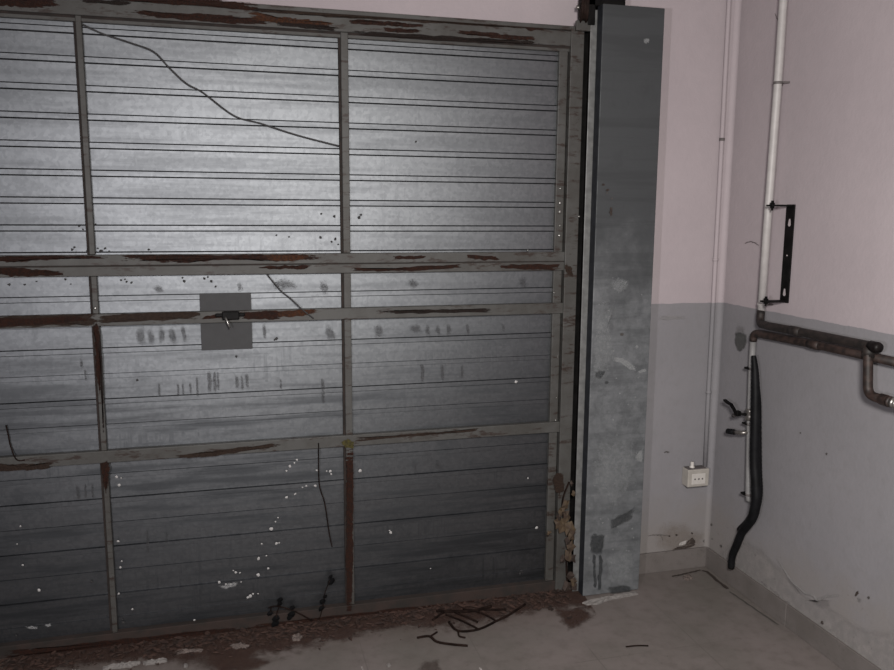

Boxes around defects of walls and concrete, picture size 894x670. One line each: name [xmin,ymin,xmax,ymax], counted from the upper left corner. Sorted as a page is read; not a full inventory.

corrosion [0,0,58,8]
corrosion [0,21,108,277]
corrosion [80,0,544,253]
corrosion [0,277,222,450]
corrosion [122,254,321,269]
corrosion [240,309,316,320]
corrosion [341,255,573,308]
corrosion [0,319,596,670]